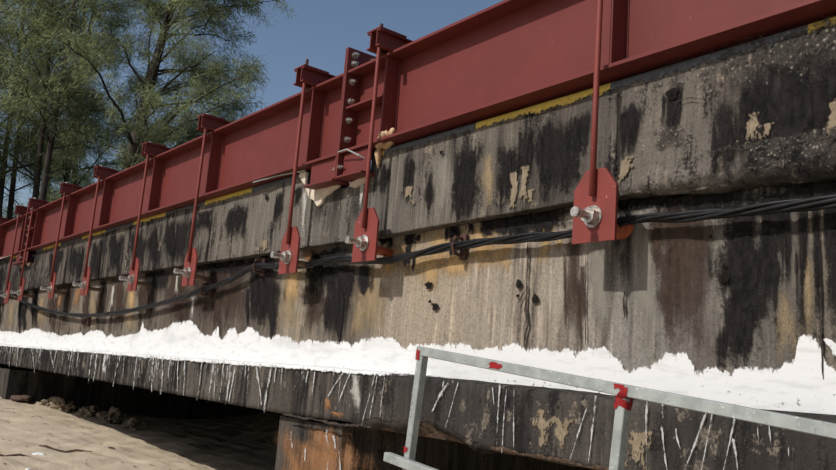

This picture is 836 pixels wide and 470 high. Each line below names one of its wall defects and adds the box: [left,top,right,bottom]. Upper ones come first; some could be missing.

spalling [690,98,836,185]
flaking render [299,172,366,207]
leakage [402,160,415,202]
leakage [423,111,591,257]
peeling [508,166,534,209]
leakage [616,47,836,369]
leakage [0,205,387,343]
leakage [563,239,613,350]
leakage [350,375,361,406]
rust [283,429,357,470]
peeling [491,408,609,470]
peeling [625,431,652,470]